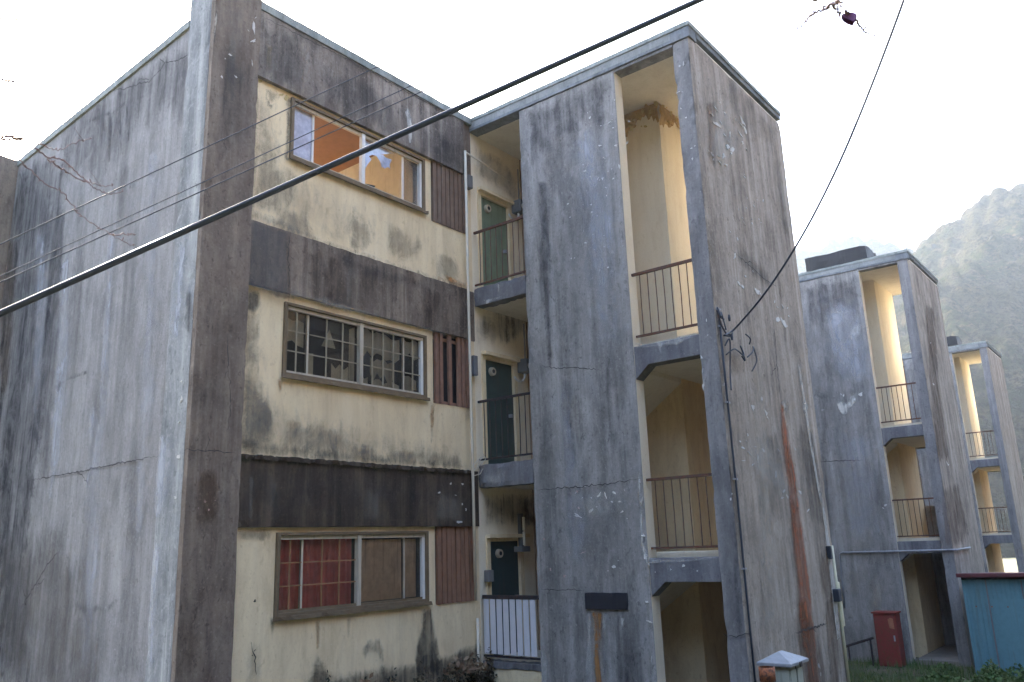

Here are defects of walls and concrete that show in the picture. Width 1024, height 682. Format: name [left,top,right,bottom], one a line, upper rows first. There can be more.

damp [246,391,275,449]
spalling [837,392,862,414]
crack [27,455,159,483]
crack [541,479,636,490]
rust [781,407,839,682]
damp [311,610,477,682]